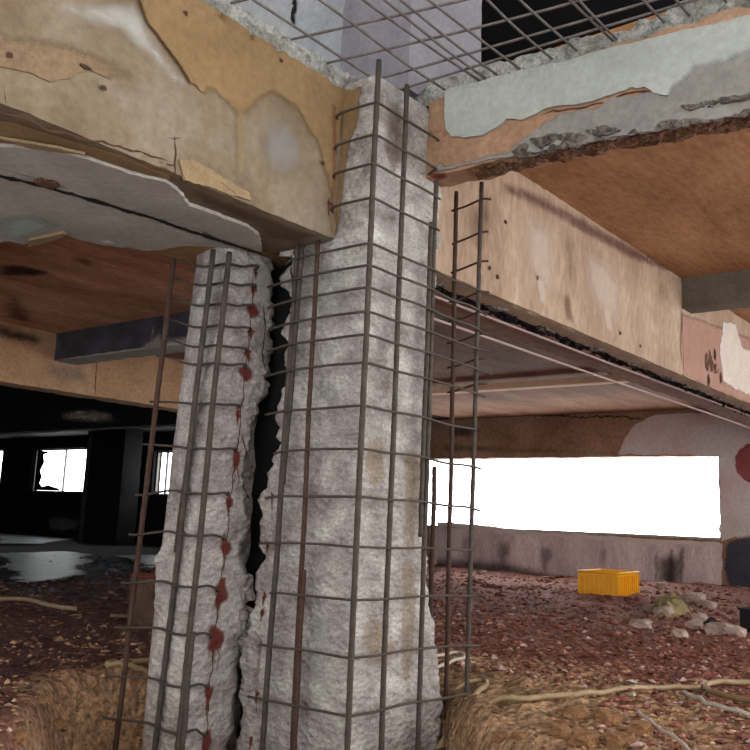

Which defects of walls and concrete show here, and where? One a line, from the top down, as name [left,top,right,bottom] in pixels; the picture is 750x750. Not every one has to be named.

flaking render [140,0,361,226]
rust [247,269,259,318]
crack [0,168,293,613]
rust [239,350,251,380]
flaking render [252,0,750,750]
flaking render [0,120,262,750]
rust [215,571,228,611]
rust [221,535,231,560]
damp [662,554,679,582]
rust [208,625,224,661]
rust [205,684,213,714]
crack [235,669,243,748]